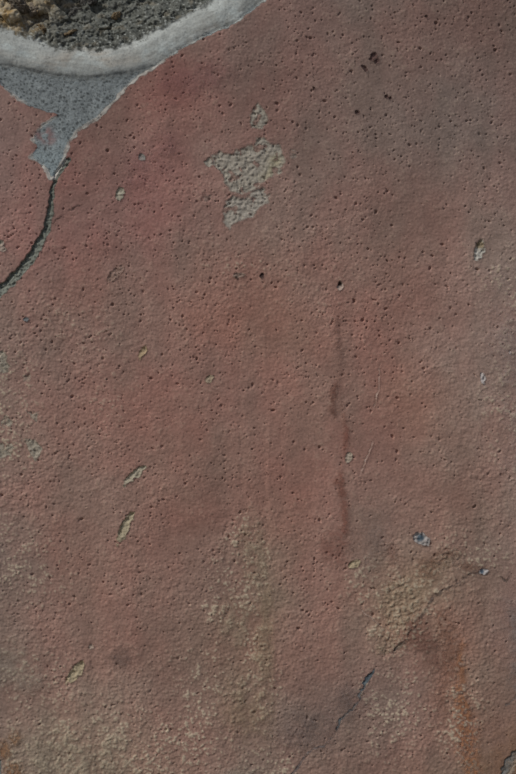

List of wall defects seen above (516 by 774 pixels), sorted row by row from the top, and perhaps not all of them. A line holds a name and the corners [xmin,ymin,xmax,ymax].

spalling [0,0,266,180]
crack [0,157,80,298]
spalling [204,104,296,228]
crack [501,751,516,774]